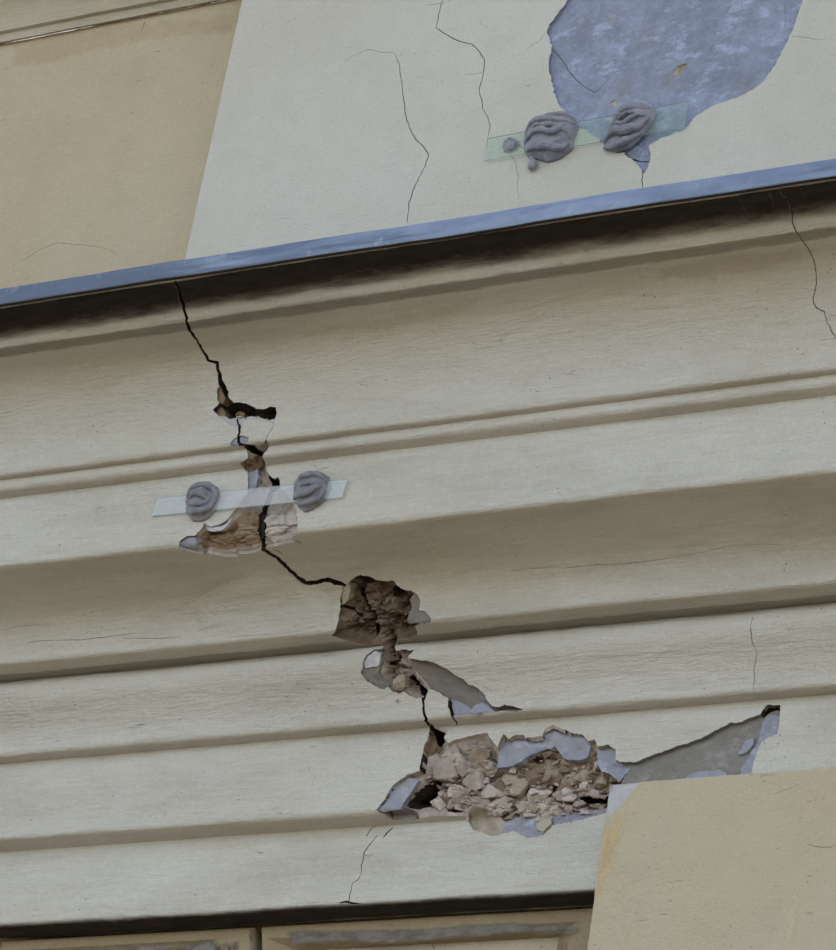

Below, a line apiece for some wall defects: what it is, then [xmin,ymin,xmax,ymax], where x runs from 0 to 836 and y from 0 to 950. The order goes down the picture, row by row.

crack [340,49,429,222]
crack [431,0,491,140]
peeling [547,0,803,174]
crack [769,190,836,337]
crack [174,279,229,398]
spalling [179,387,302,557]
crack [260,514,346,587]
crack [420,696,446,774]
spalling [332,575,780,837]
crack [339,826,393,904]